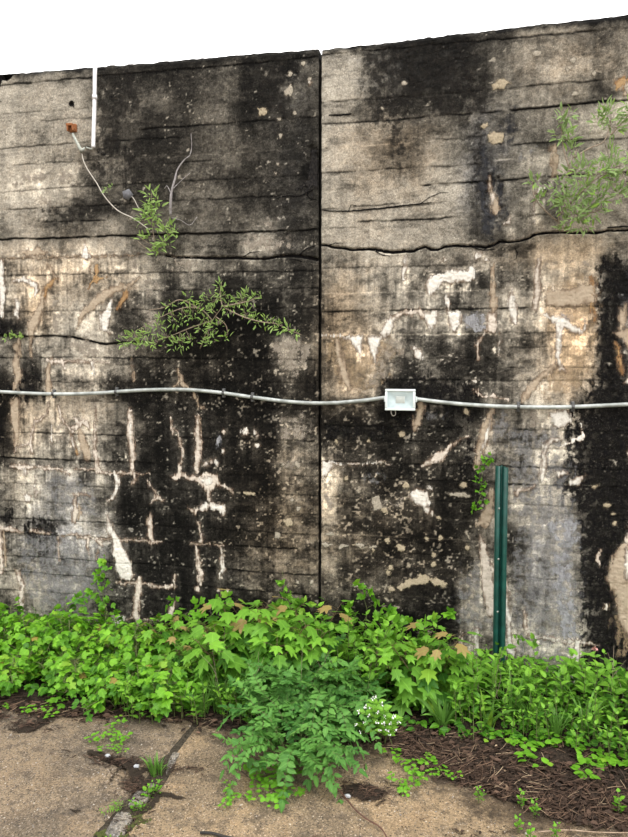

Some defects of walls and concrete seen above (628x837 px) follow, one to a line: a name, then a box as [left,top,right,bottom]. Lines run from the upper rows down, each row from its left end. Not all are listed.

leakage [88,67,144,199]
leakage [358,39,509,240]
leakage [497,104,518,153]
leakage [41,203,109,227]
crack [166,226,628,262]
leakage [321,252,518,483]
leakage [170,368,234,594]
leakage [321,458,390,512]
leakage [371,486,434,517]
leakage [475,488,495,618]
leakage [513,253,628,684]
leakage [505,580,516,657]